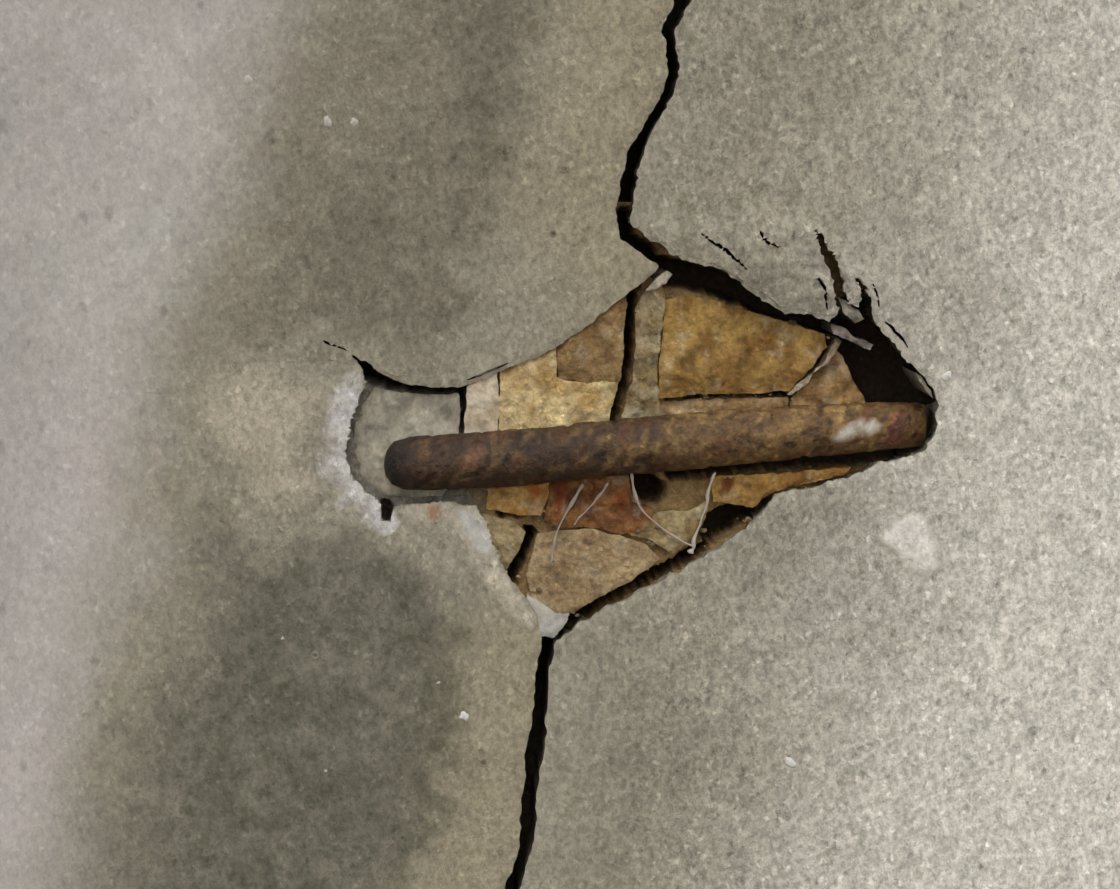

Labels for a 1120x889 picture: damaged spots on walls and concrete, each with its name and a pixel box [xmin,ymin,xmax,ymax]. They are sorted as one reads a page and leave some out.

crack [616,0,692,221]
water stain [0,0,565,889]
spalling [345,202,941,641]
crack [505,636,556,889]